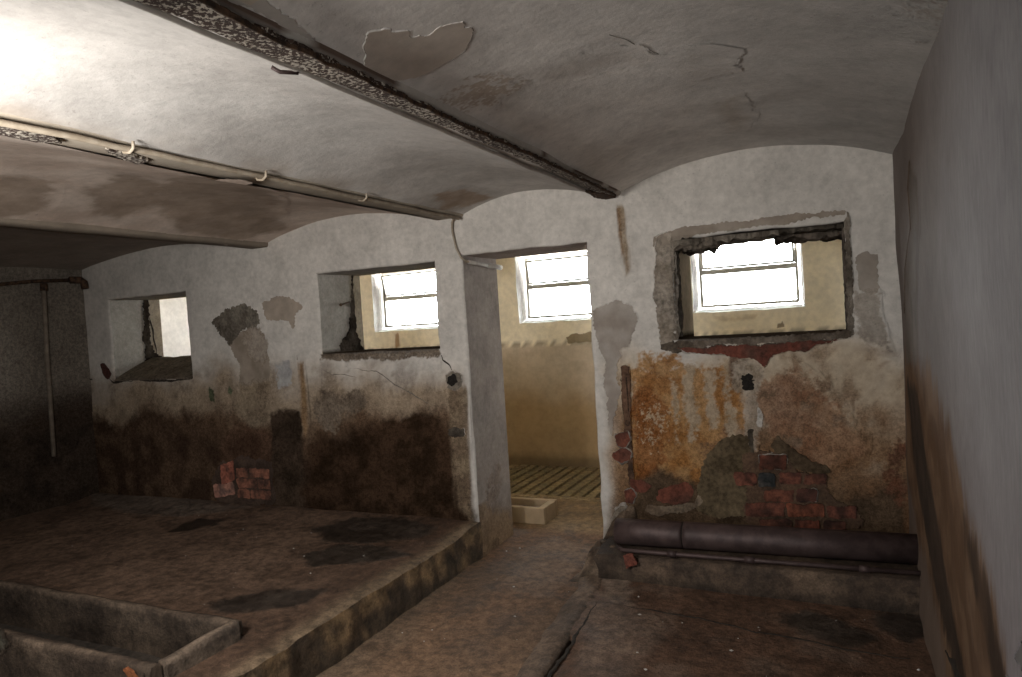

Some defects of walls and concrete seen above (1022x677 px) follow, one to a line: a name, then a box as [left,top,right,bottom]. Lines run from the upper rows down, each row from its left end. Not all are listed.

peeling [228,0,315,41]
peeling [362,21,474,81]
damp [0,170,293,241]
flaking render [211,303,270,383]
flaking render [652,210,855,399]
rust [624,347,744,478]
rust [758,359,872,476]
flaking render [211,455,276,506]
damp [0,378,513,569]